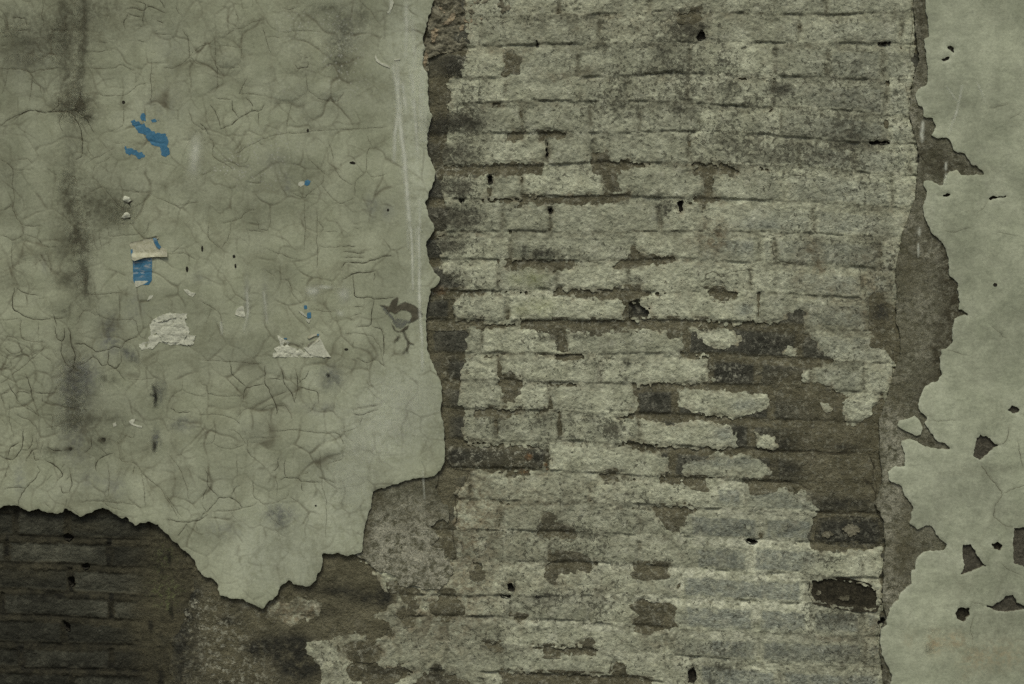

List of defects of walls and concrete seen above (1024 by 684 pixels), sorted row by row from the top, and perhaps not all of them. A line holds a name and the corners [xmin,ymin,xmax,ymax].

crack [1,14,194,244]
crack [83,2,393,365]
crack [1,161,342,535]
peeling [0,505,397,684]
peeling [342,0,986,684]
peeling [973,435,998,460]
peeling [987,595,1024,612]
peeling [992,527,1024,567]